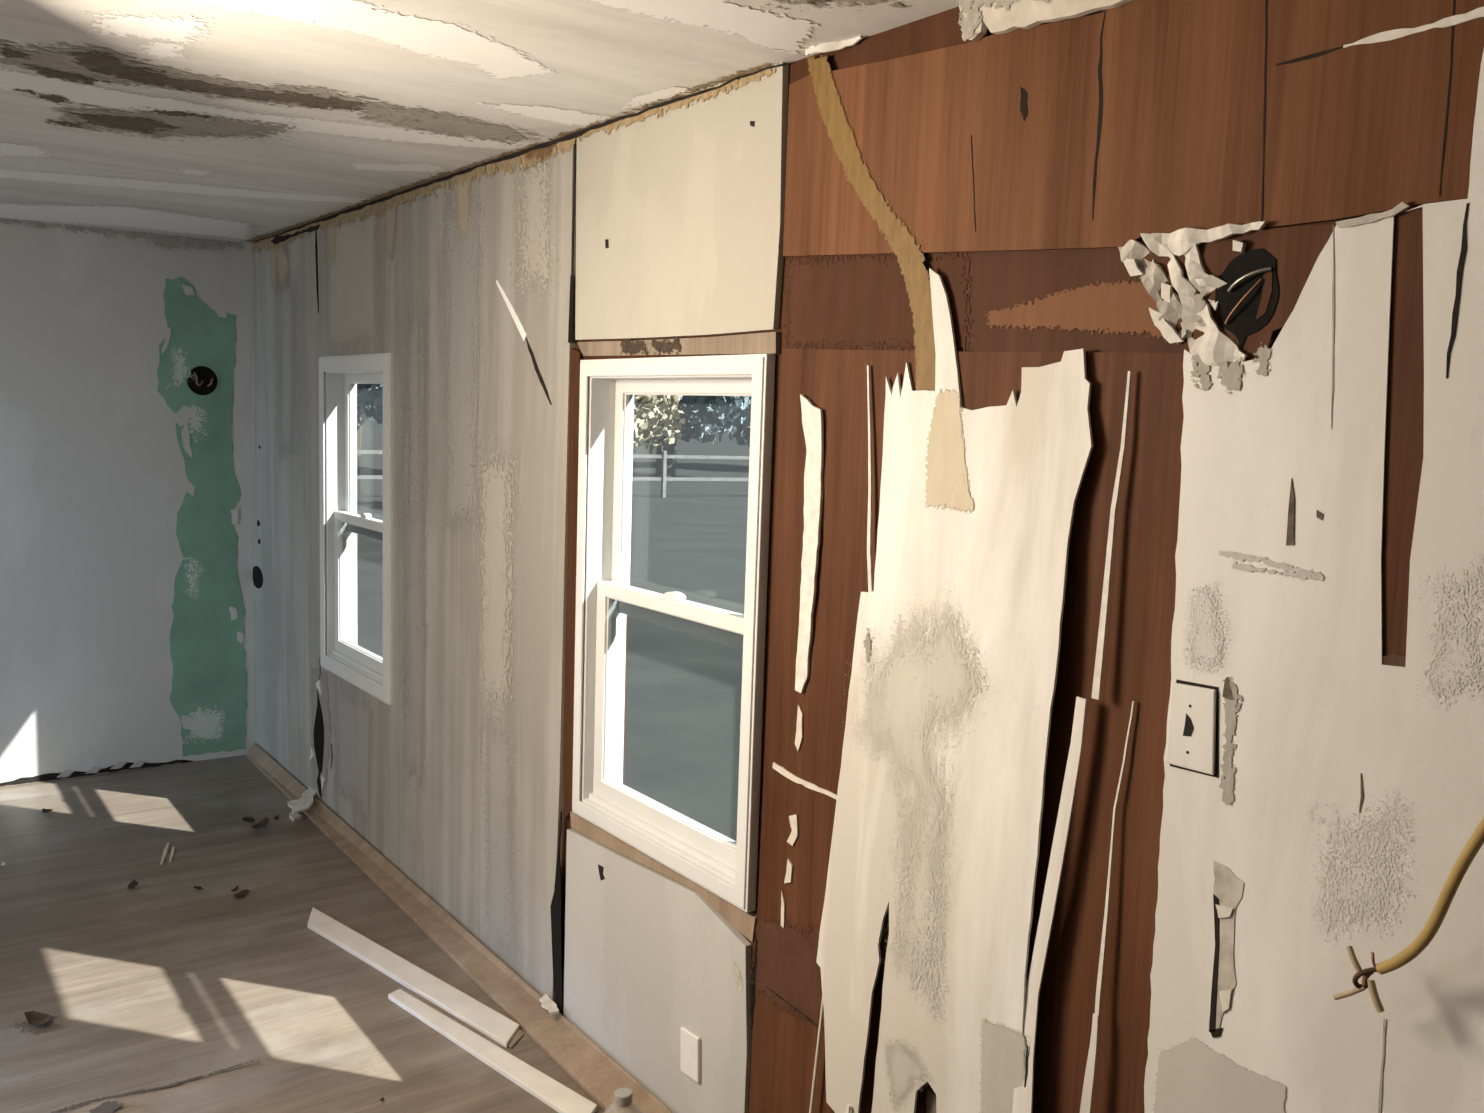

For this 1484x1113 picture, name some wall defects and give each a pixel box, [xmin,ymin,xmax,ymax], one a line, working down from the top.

peeling [157,276,263,757]
damp [0,40,778,969]